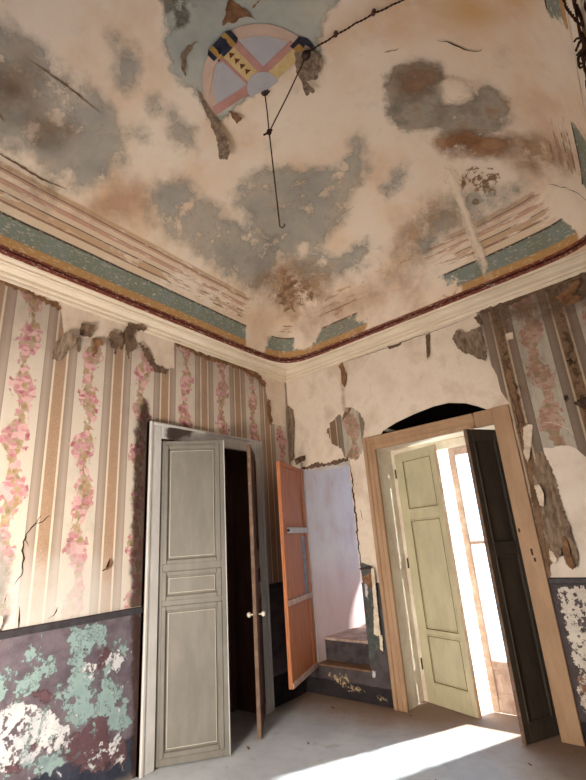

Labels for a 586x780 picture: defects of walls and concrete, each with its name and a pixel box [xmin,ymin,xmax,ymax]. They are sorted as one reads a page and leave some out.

water stain [384,62,509,143]
water stain [263,266,326,312]
crack [4,515,50,628]
peeling [0,622,133,780]
peeling [557,585,586,712]